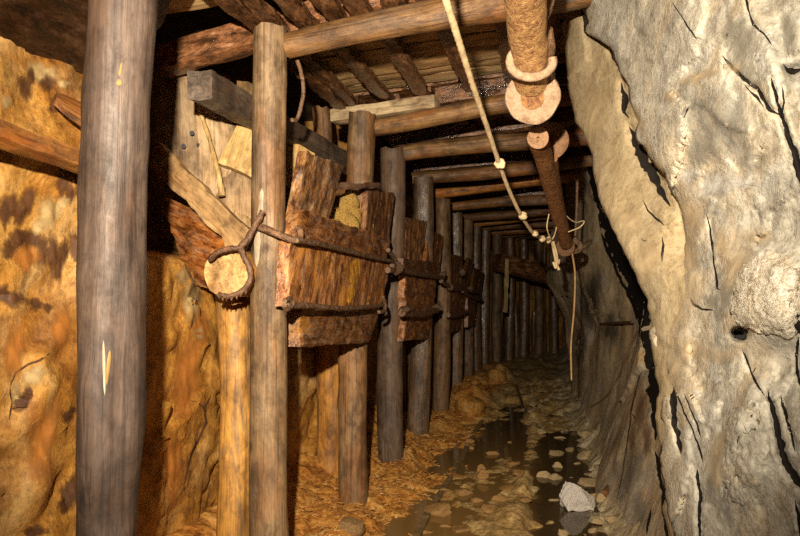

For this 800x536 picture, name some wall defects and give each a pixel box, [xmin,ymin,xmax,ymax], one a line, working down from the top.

crack [722,55,800,183]
crack [588,166,703,536]
crack [742,350,800,536]